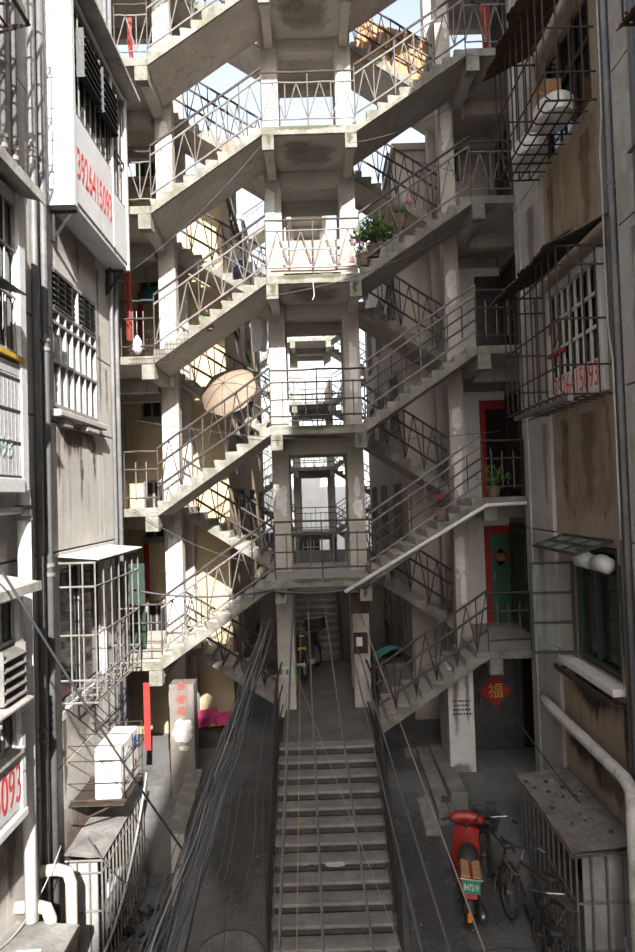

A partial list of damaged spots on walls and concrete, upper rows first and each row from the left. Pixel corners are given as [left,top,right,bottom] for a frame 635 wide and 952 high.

damp [57,428,96,496]
damp [561,397,610,512]